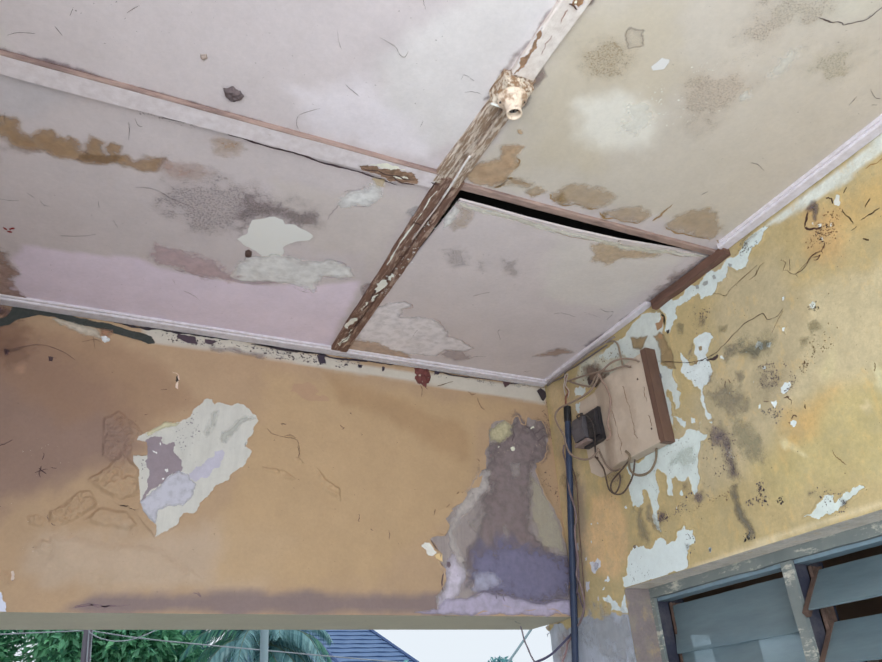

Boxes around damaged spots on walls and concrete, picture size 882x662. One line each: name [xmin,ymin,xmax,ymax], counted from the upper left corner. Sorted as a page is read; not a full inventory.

crack [818,7,882,25]
crack [228,134,396,185]
peeling [358,163,419,185]
water stain [158,176,382,236]
peeling [237,216,313,257]
peeling [338,182,705,346]
water stain [0,247,474,371]
water stain [430,370,518,387]
peeling [132,397,260,539]
peeling [546,224,771,662]
water stain [638,425,768,542]
peeling [801,482,869,522]